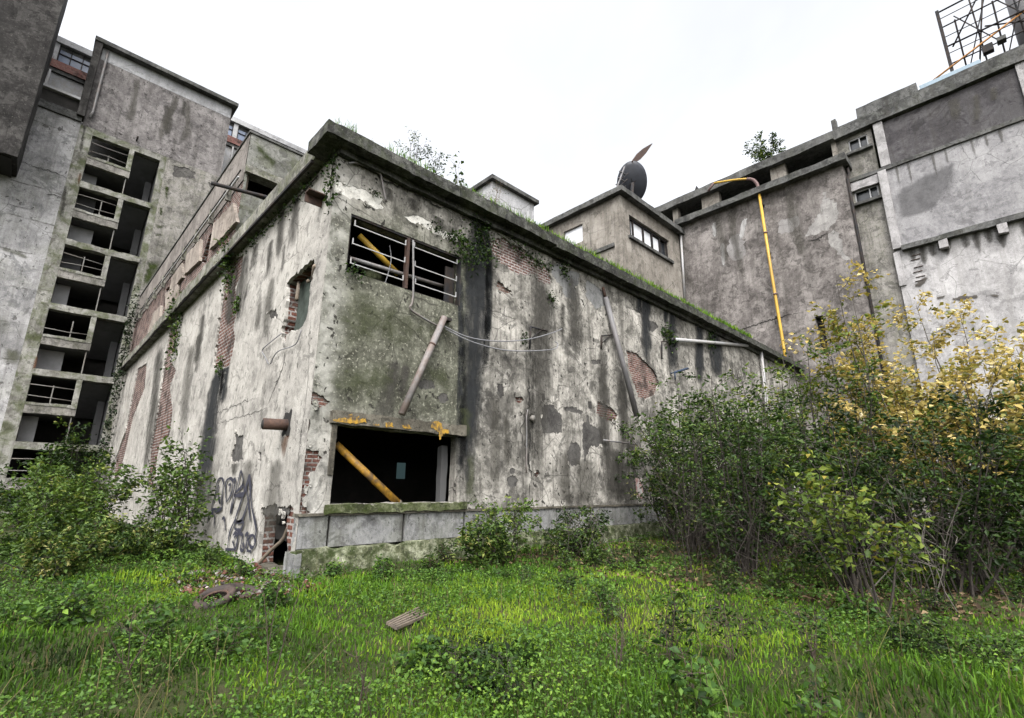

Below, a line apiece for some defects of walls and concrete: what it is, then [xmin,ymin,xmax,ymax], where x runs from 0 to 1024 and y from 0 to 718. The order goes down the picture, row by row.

peeling [334,179,384,209]
leakage [899,166,952,216]
flaking render [114,363,147,483]
flaking render [149,327,178,486]
flaking render [214,255,243,367]
spalling [266,262,314,341]
leakage [456,220,492,486]
flaking render [490,235,605,309]
flaking render [626,351,658,400]
flaking render [260,443,321,552]